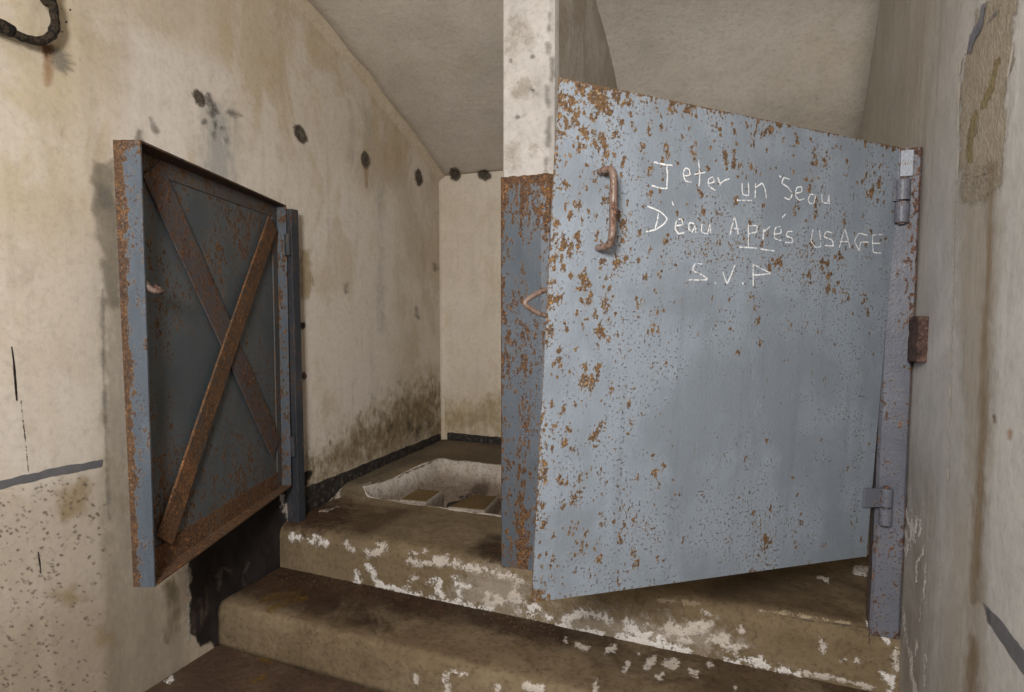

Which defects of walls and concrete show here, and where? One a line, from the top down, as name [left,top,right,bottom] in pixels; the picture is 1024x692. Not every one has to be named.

spalling [956,0,1018,203]
leakage [309,391,439,476]
peeling [760,609,870,643]